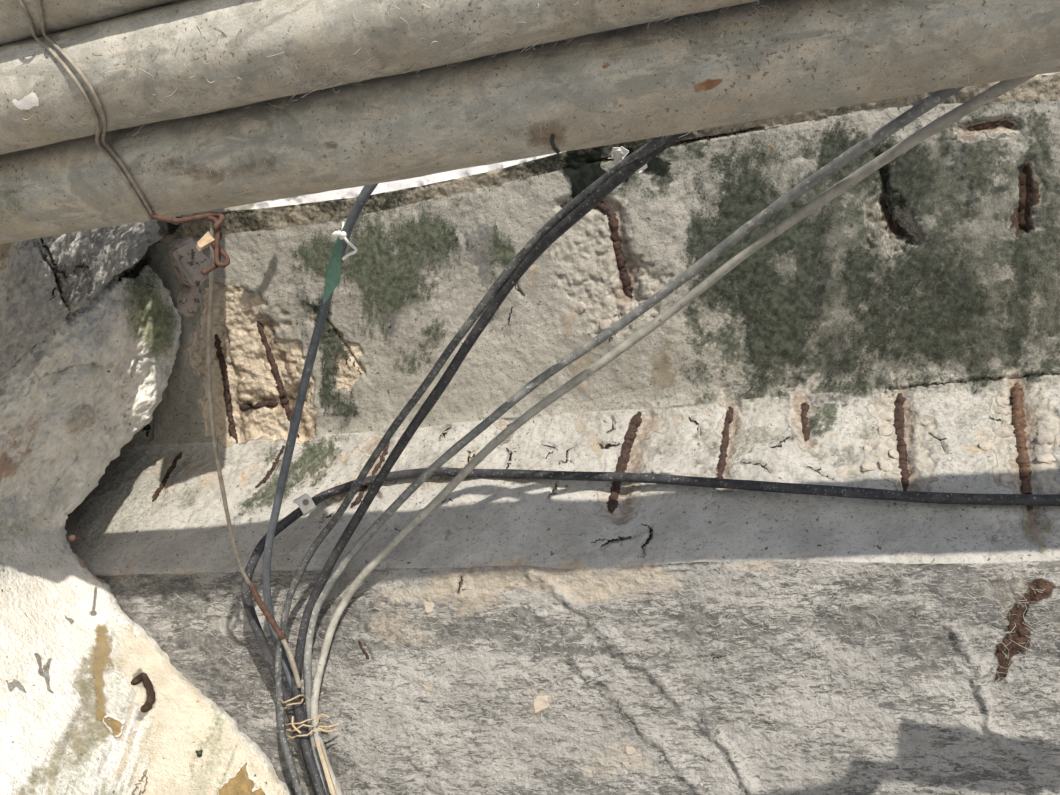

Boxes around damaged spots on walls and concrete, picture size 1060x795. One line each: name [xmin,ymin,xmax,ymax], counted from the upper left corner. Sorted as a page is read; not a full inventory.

crack [39,238,90,311]
spalling [545,215,673,338]
rust [575,194,662,316]
spalling [186,283,317,444]
rust [595,396,665,524]
spalling [861,400,941,490]
rust [880,378,931,492]
spalling [1023,388,1060,494]
crack [591,524,653,554]
rust [994,578,1056,683]
rust [131,669,156,720]
peeling [217,761,268,795]